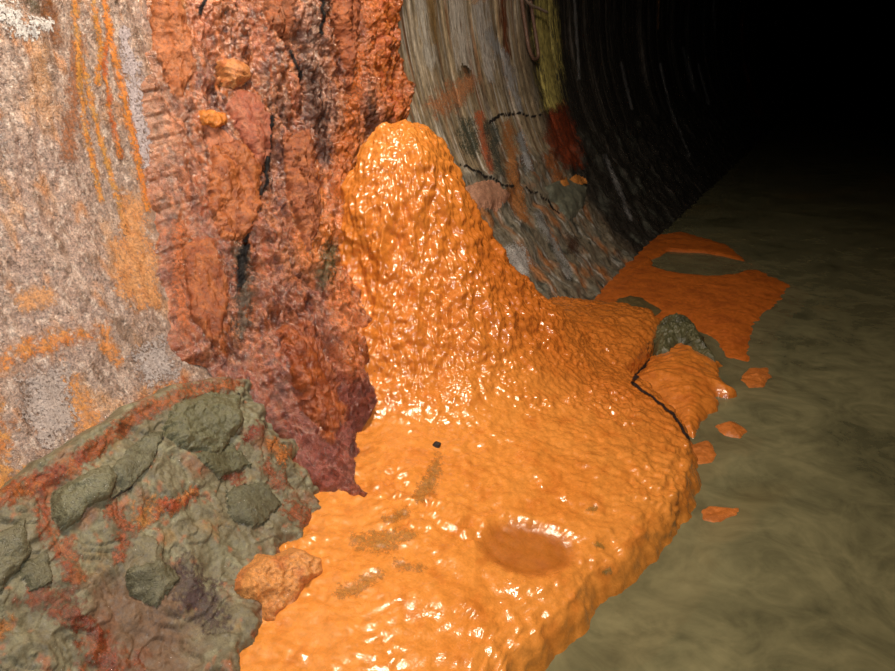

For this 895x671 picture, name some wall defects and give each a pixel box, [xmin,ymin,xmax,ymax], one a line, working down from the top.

damp [0,0,55,42]
rust [41,0,162,310]
rust [502,119,528,222]
rust [170,220,193,342]
rust [0,322,124,372]
damp [14,353,80,450]
crack [630,358,691,440]
rust [243,420,292,492]
rust [0,373,245,671]
rust [278,500,312,527]
damp [172,554,233,633]